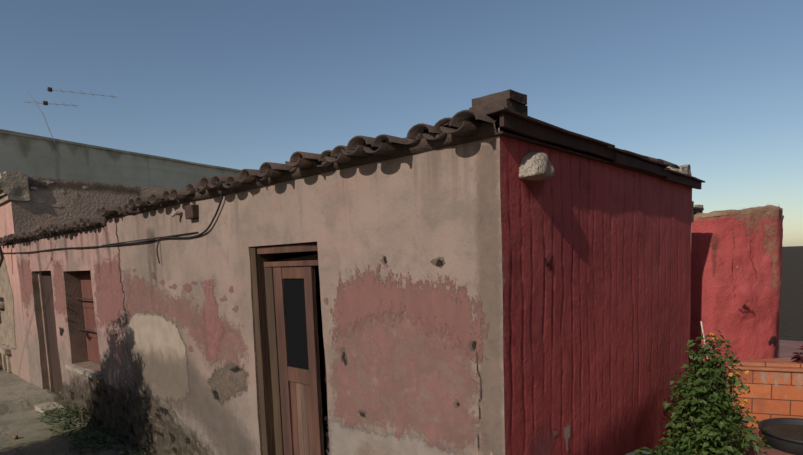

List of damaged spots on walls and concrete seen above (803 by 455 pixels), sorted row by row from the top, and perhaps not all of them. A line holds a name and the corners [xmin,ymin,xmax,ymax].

peeling [121,269,249,405]
crack [475,352,483,450]